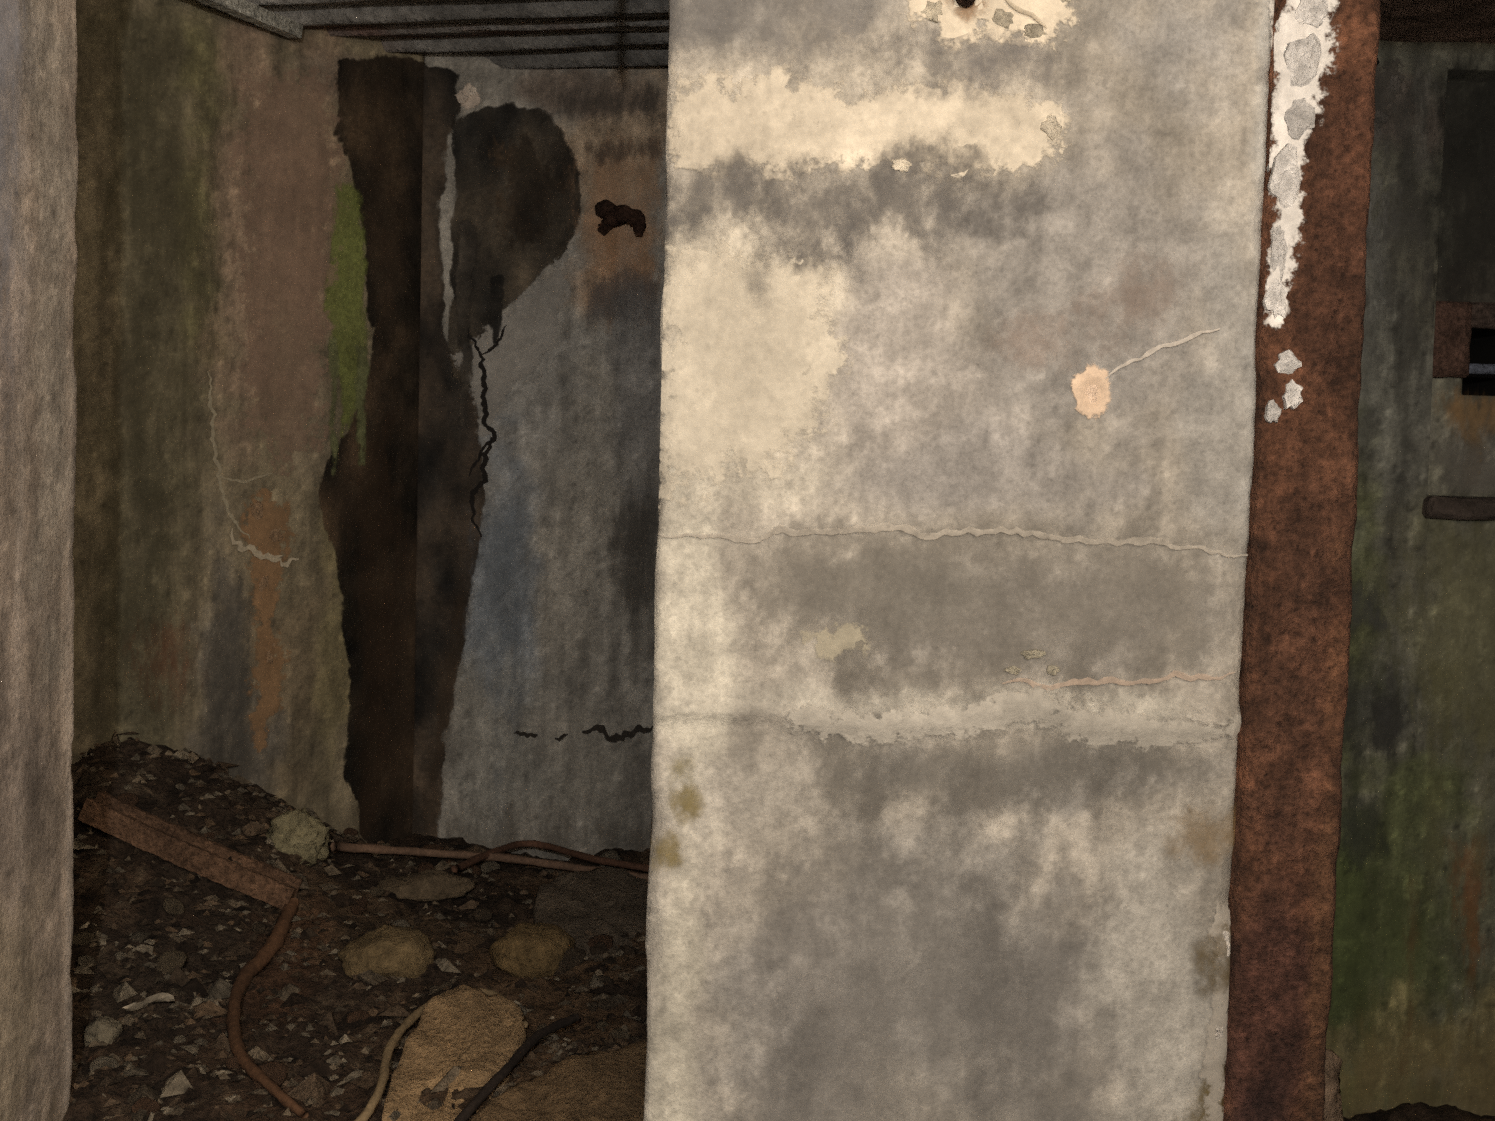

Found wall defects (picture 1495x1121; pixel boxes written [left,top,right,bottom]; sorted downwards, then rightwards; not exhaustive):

water stain [319,54,581,843]
crack [513,724,653,743]